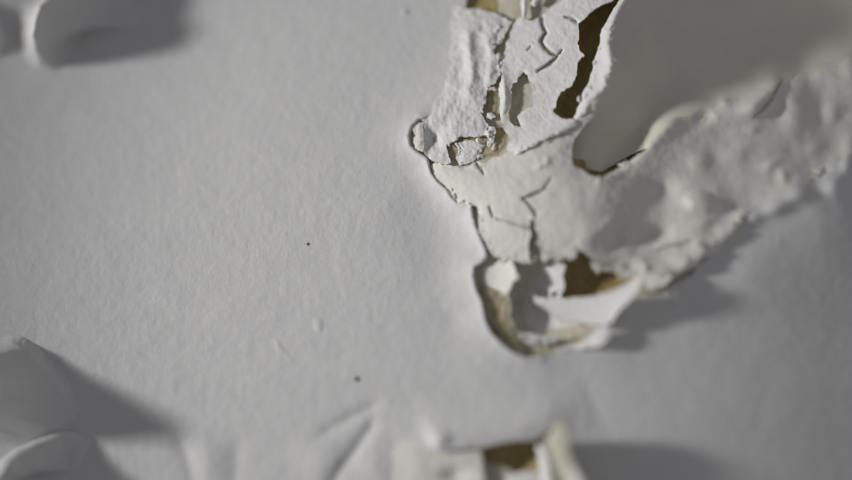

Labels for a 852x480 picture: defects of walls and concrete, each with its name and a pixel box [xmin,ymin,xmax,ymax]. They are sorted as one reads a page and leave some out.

crack [528,14,562,71]
peeling [410,0,852,298]
crack [472,180,550,254]
peeling [390,421,581,480]